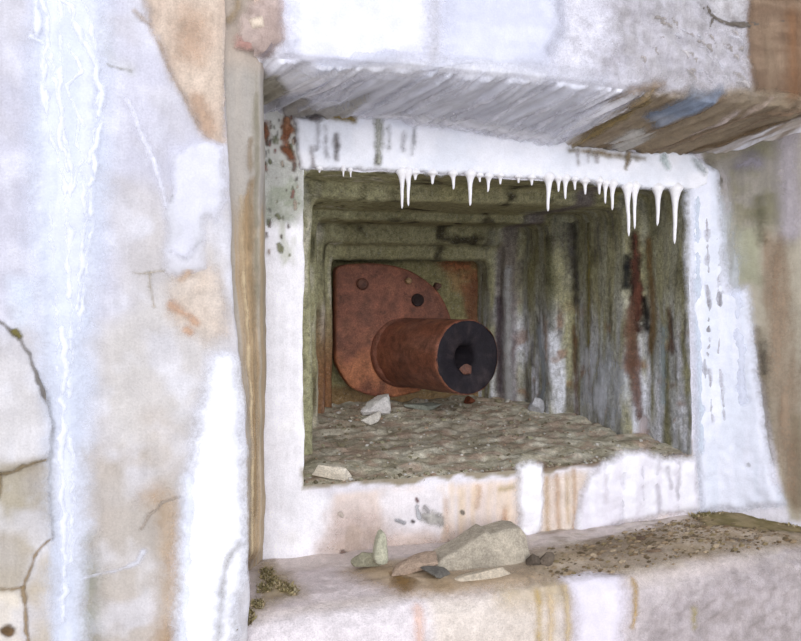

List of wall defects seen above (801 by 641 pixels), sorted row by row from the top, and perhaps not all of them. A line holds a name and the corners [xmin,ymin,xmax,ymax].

crack [0,321,55,641]
damp [242,181,260,562]
corrosion [281,116,295,161]
damp [265,53,794,420]